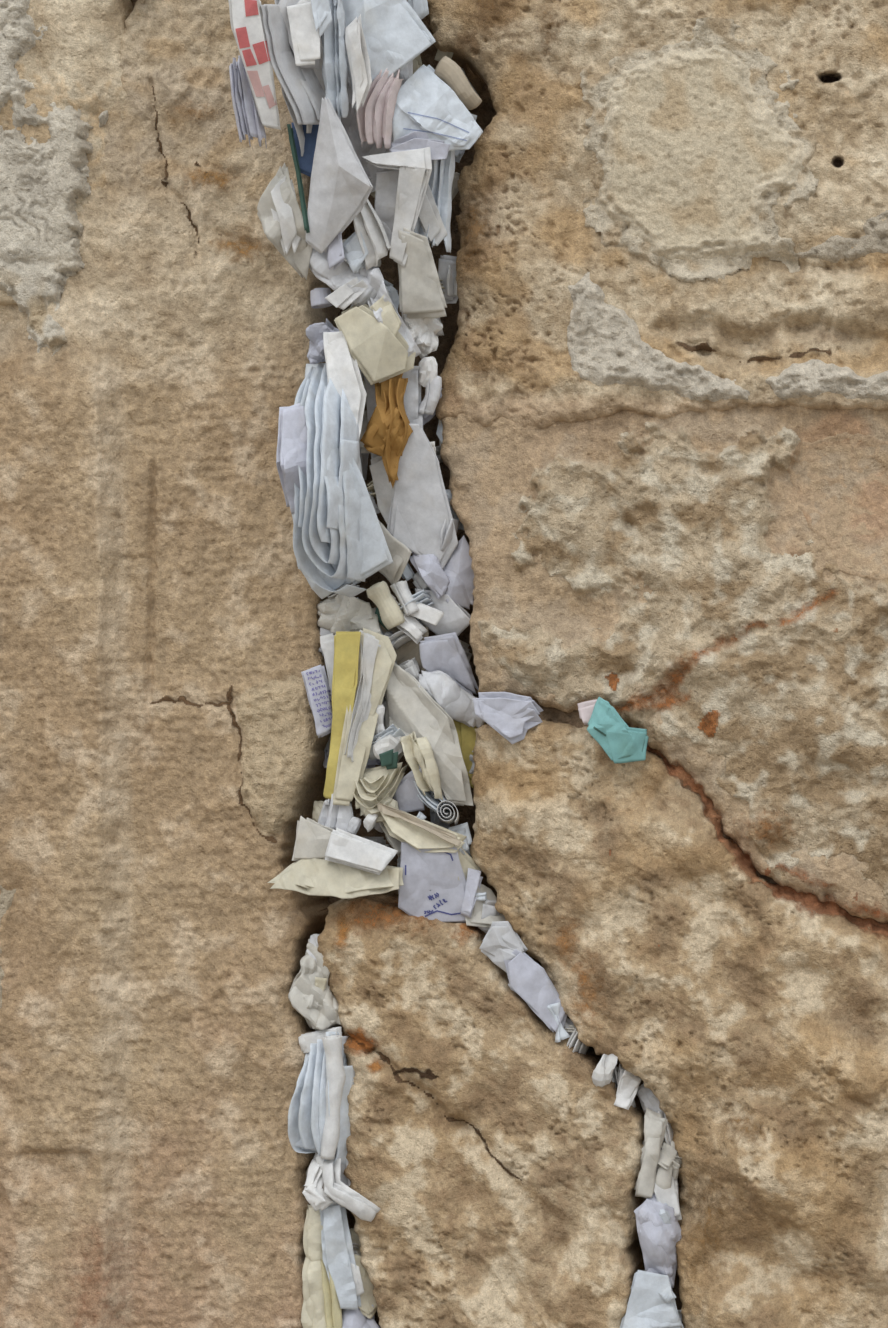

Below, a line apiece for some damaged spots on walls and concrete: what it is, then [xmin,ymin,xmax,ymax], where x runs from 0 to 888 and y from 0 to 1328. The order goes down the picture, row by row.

peeling [0,0,109,356]
crack [152,86,222,253]
crack [629,725,888,937]